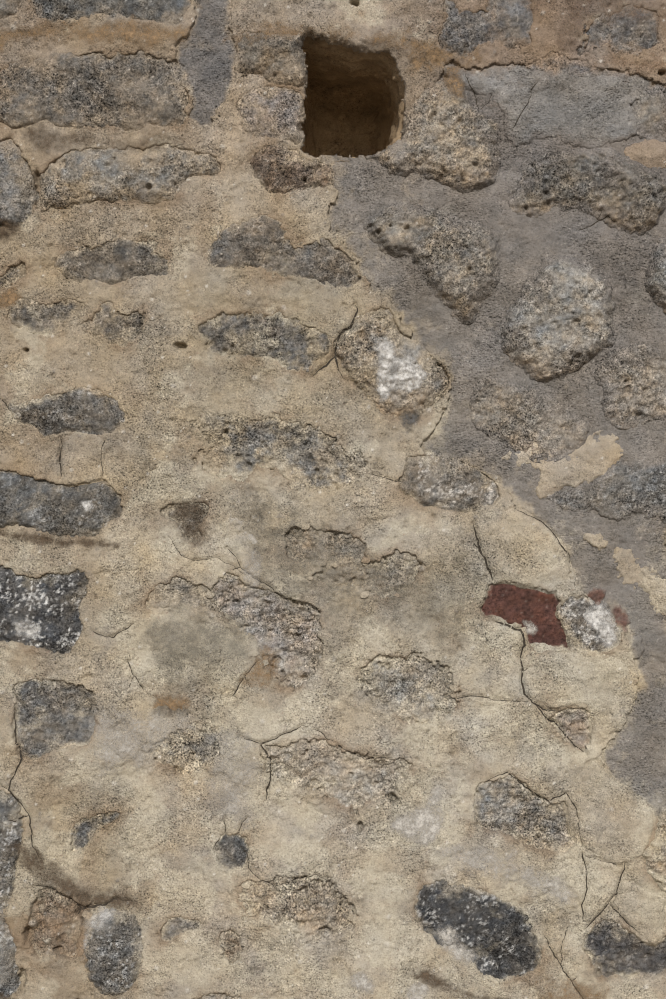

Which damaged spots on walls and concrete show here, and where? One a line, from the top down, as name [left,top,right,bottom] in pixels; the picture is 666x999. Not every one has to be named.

spalling [285,524,421,599]
crack [473,524,493,580]
crack [518,510,571,567]
spalling [357,650,459,727]
crack [457,621,587,755]
spalling [550,704,593,751]
crack [2,711,39,858]
spalling [260,737,412,815]
crack [489,772,637,999]